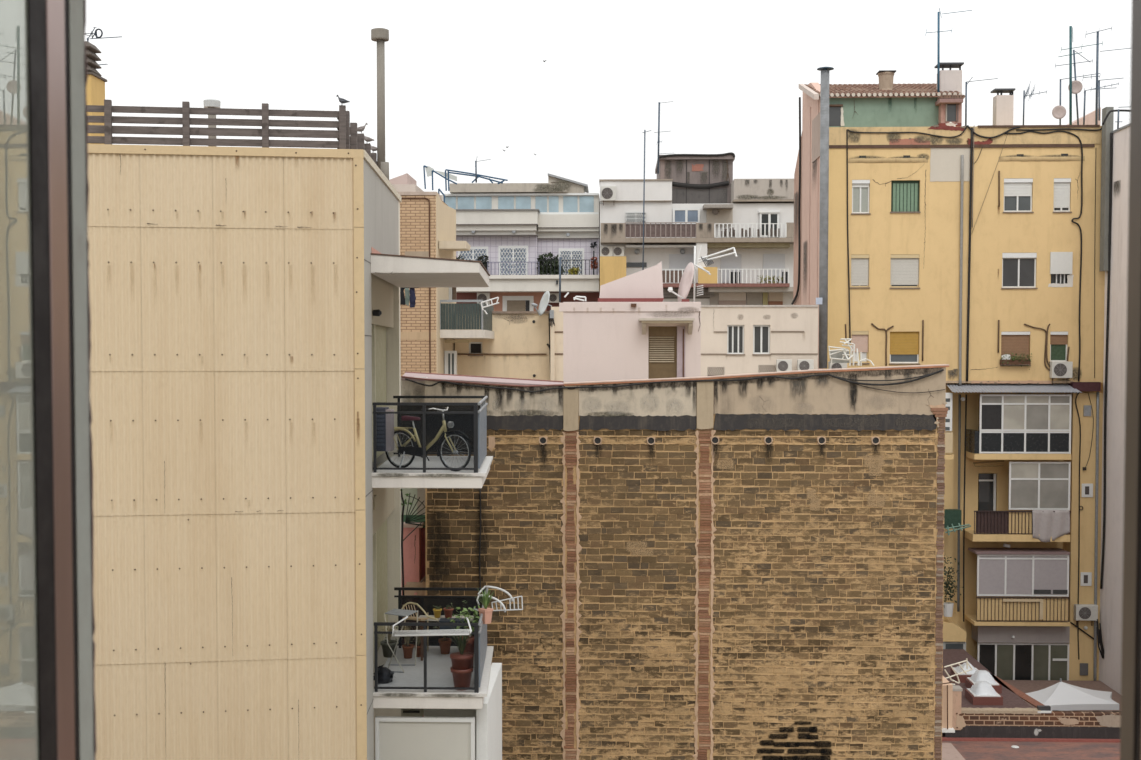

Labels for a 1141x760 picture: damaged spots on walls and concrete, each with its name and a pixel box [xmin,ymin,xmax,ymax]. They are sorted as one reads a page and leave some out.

leakage [442,383,563,416]
leakage [584,382,696,399]
leakage [714,368,958,405]